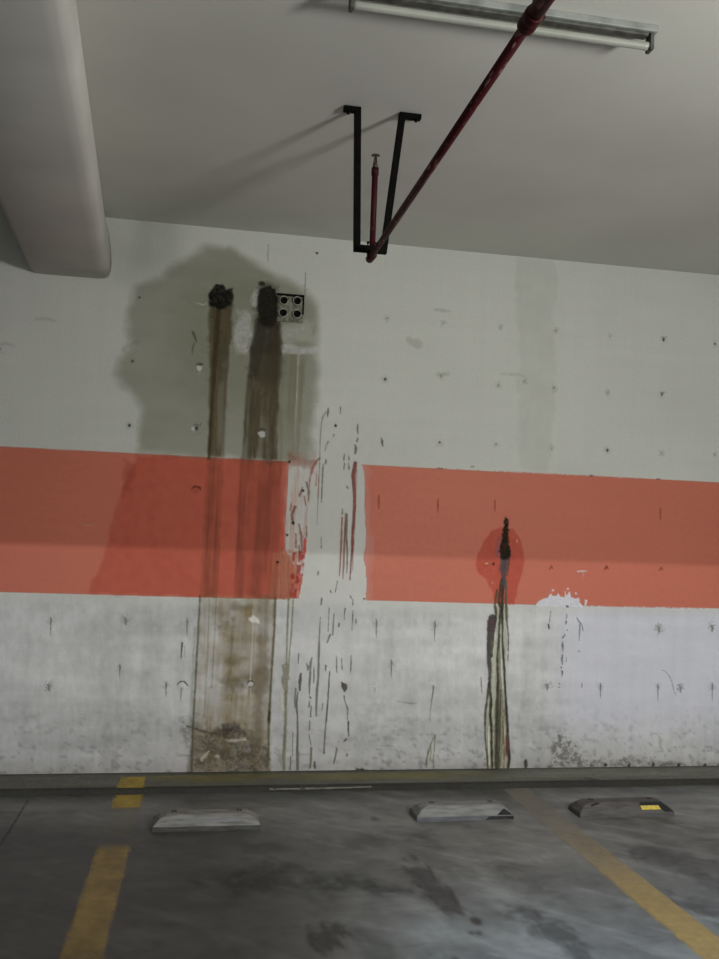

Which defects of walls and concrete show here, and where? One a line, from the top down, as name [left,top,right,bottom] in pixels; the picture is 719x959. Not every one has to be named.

water stain [208,284,234,459]
water stain [244,281,280,459]
corrosion [191,596,276,772]
peeling [536,588,587,688]